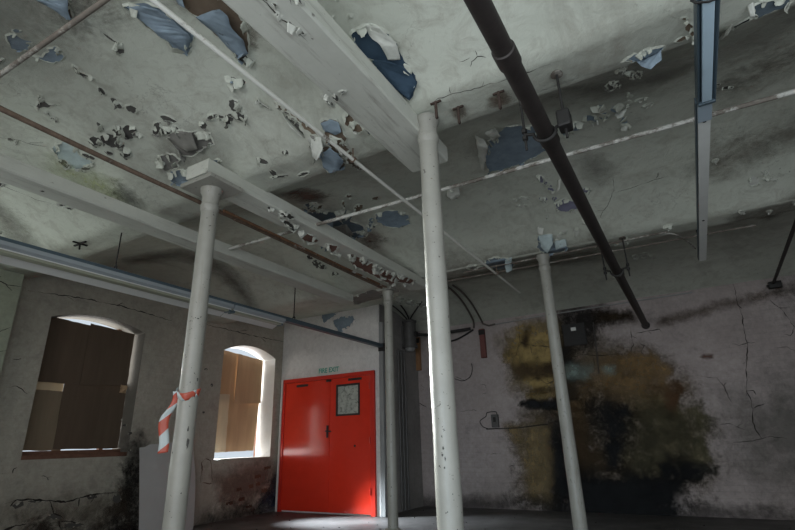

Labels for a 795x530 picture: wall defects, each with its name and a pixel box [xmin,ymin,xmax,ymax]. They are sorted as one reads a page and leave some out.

peeling [122,0,256,69]
peeling [349,23,419,102]
peeling [719,0,795,40]
peeling [49,74,249,187]
peeling [301,193,412,240]
crack [0,276,171,321]
water stain [597,311,633,324]
crack [708,285,783,443]
water stain [463,323,571,512]
water stain [558,322,734,517]
crack [5,492,115,529]
water stain [76,434,142,530]